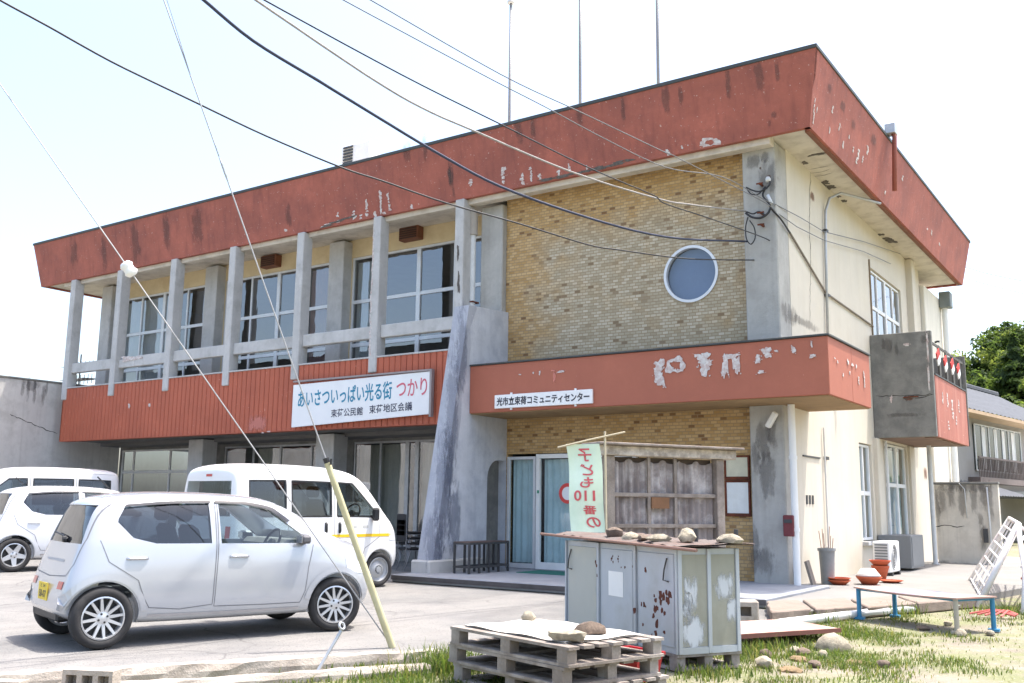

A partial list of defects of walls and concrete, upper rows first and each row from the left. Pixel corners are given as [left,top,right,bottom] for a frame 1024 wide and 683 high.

peeling [666,138,721,156]
peeling [829,106,869,164]
peeling [321,190,391,228]
peeling [652,352,741,388]
peeling [755,347,778,375]